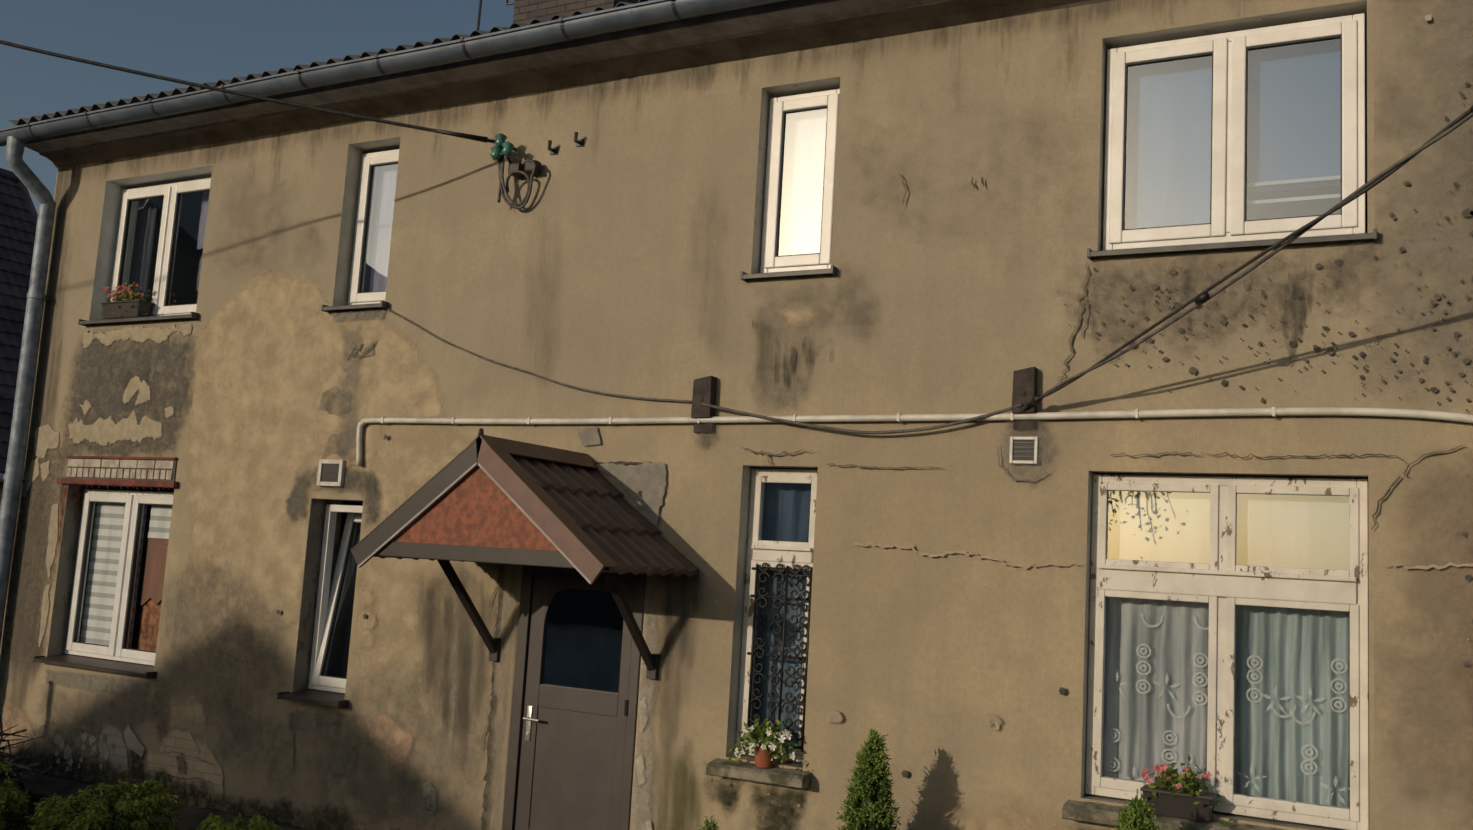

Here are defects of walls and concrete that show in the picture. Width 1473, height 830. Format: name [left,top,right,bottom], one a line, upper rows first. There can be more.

water stain [1064,207,1473,422]
peeling [67,323,192,457]
crack [854,542,1081,569]
crack [1110,445,1473,570]
flaking render [25,720,224,808]
water stain [426,573,499,825]